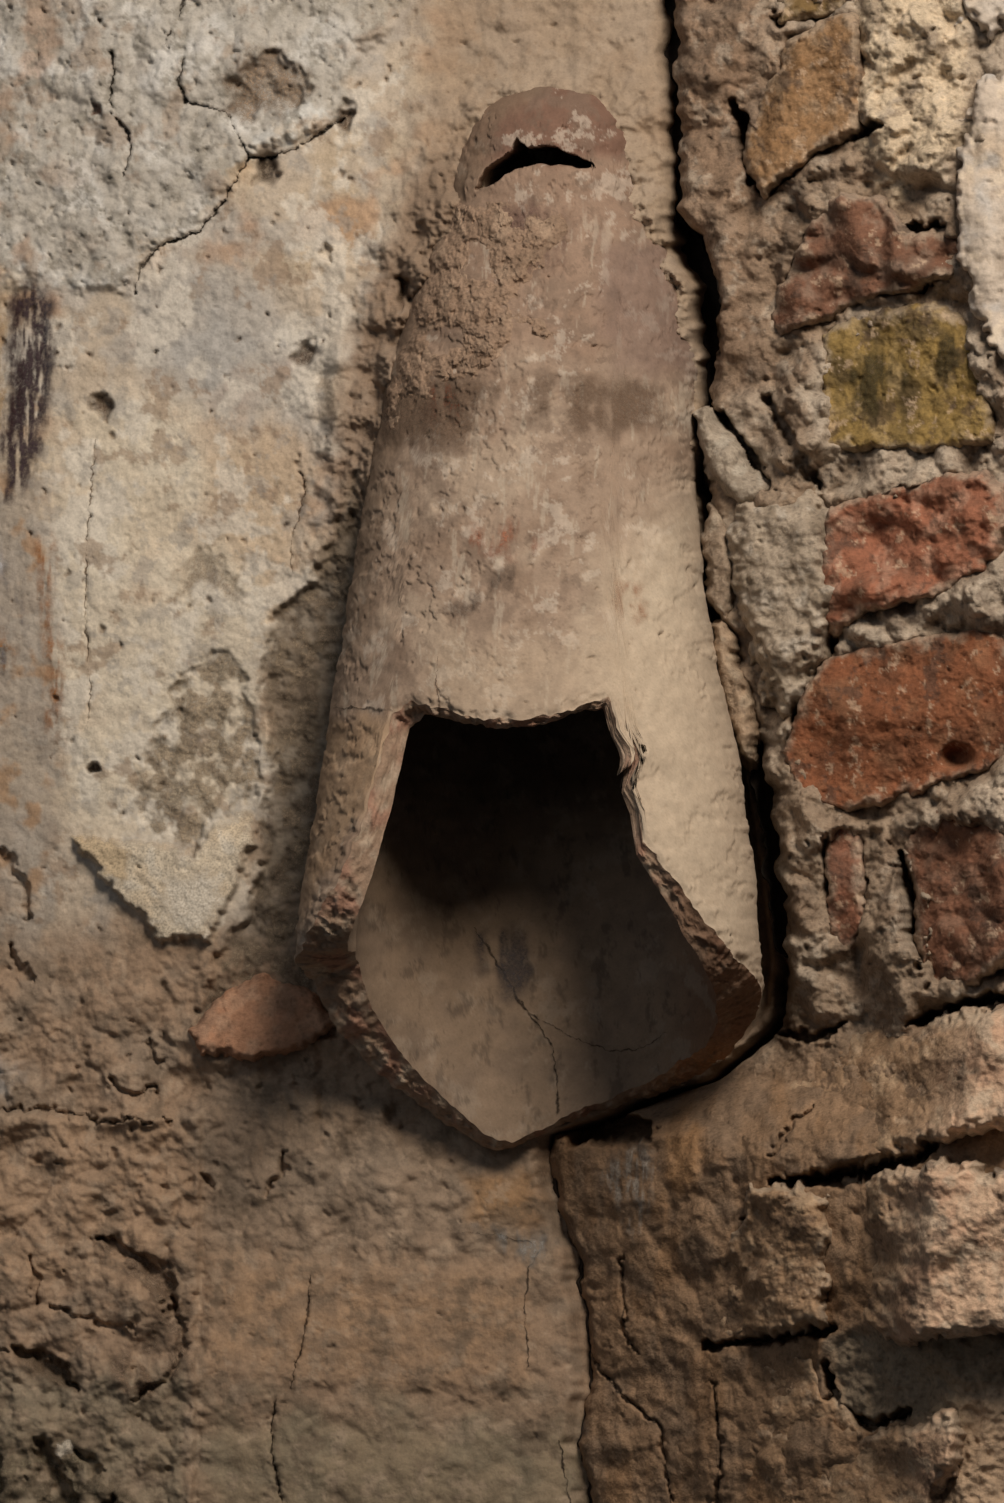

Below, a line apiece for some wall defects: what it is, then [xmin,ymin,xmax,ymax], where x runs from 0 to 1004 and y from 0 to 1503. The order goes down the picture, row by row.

crack [109,51,132,176]
crack [135,0,345,295]
crack [664,0,721,407]
water stain [0,283,54,499]
crack [749,742,788,958]
crack [919,995,1004,1023]
crack [781,1149,936,1182]
spalling [17,1346,79,1392]
spalling [0,1440,132,1503]
spalling [98,1232,192,1397]
crack [493,1153,672,1503]
crack [713,1327,827,1495]